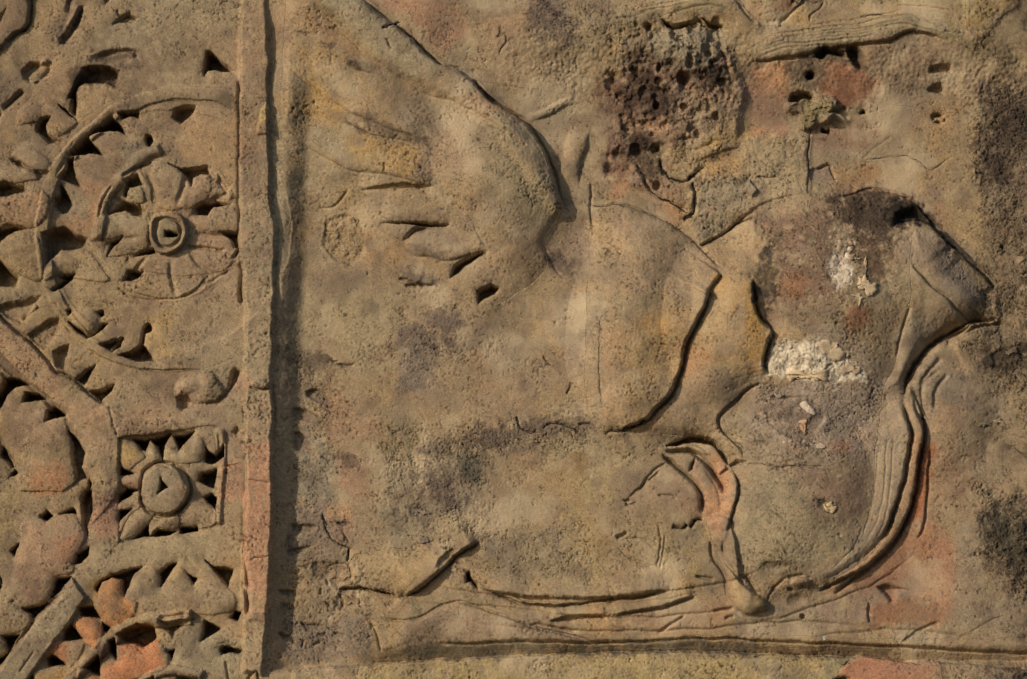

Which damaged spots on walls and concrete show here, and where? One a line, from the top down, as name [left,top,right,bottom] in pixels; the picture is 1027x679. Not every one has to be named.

spalling [651,24,726,68]
leakage [849,233,893,276]